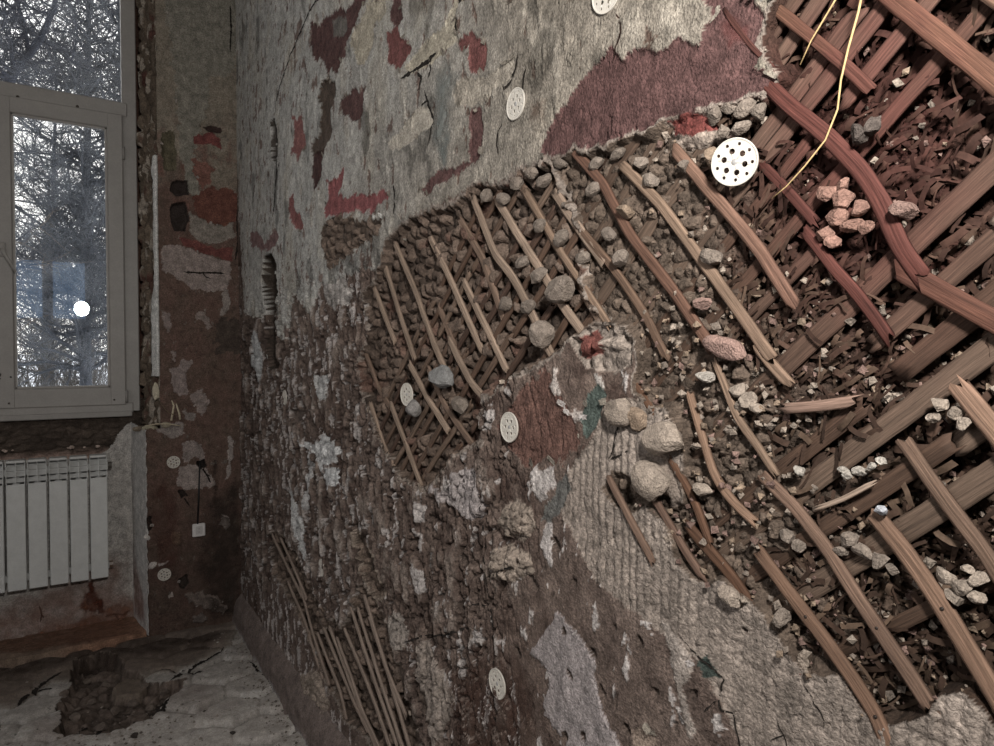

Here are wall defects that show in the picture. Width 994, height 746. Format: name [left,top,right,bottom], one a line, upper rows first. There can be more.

spalling [814,0,847,39]
spalling [852,14,901,69]
spalling [968,24,994,57]
spalling [815,36,931,147]
spalling [864,63,994,231]
spalling [735,127,835,247]
spalling [774,200,833,273]
spalling [830,212,888,277]
spalling [928,186,994,276]
spalling [267,408,455,746]
crack [17,672,61,706]
crack [133,647,224,723]